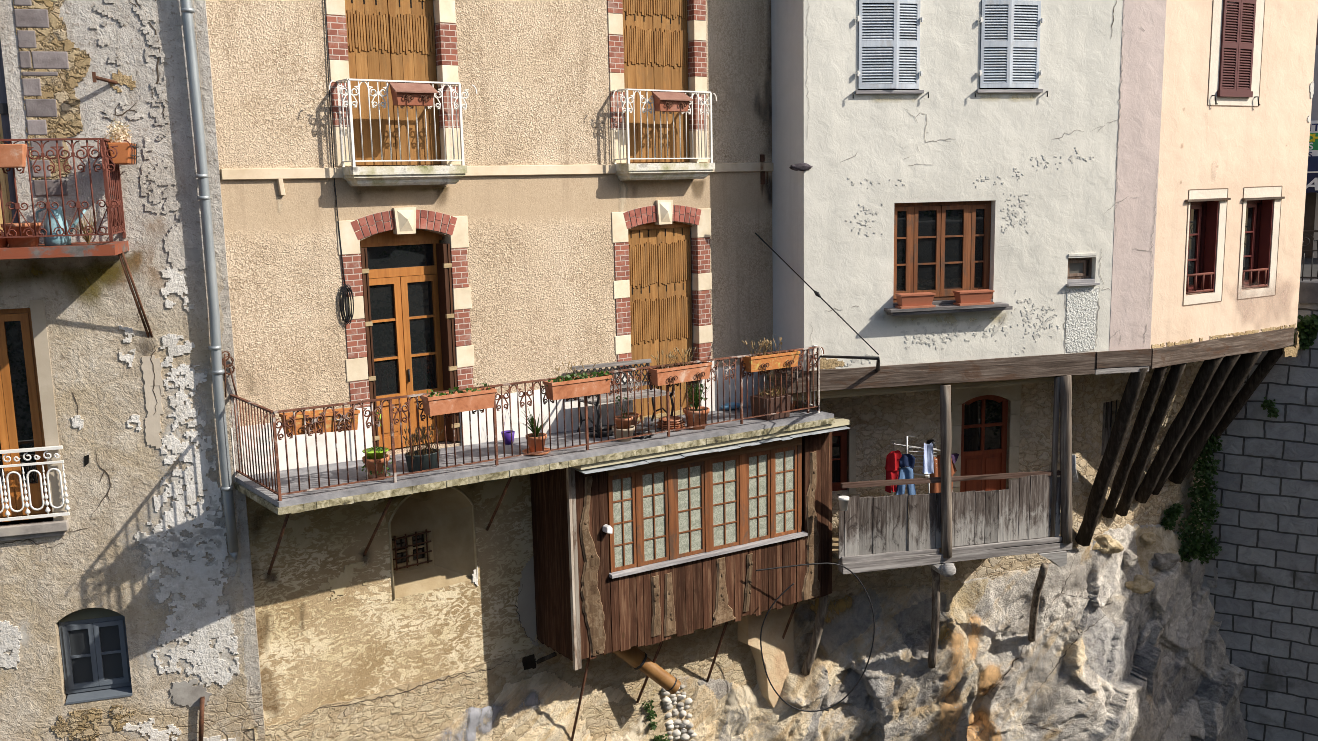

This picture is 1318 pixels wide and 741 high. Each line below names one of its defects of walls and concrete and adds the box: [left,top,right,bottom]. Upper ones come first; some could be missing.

spalling [13,0,196,311]
crack [904,113,951,166]
crack [1054,0,1158,354]
damp [0,257,136,300]
crack [0,452,111,548]
peeling [127,333,240,688]
peeling [0,620,28,669]